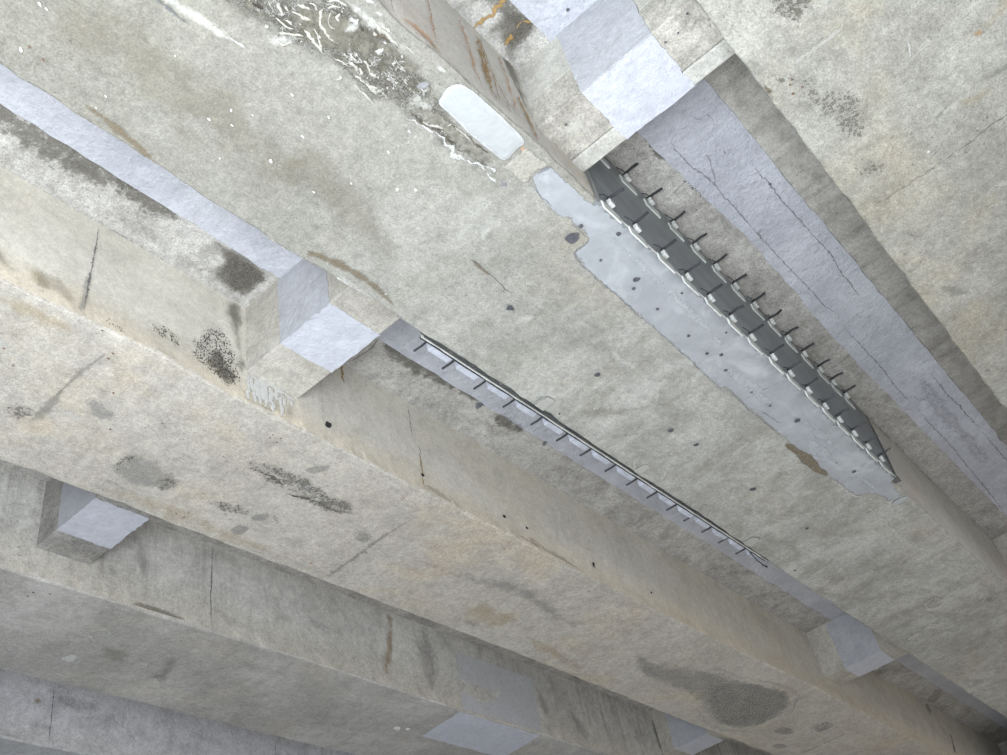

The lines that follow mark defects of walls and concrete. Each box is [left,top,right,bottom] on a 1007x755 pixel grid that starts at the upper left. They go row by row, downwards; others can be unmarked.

water stain [295,8,425,99]
corrosion [459,0,539,140]
water stain [488,0,532,50]
water stain [408,120,497,183]
crack [672,146,1007,507]
water stain [193,328,295,416]
spalling [786,443,828,476]